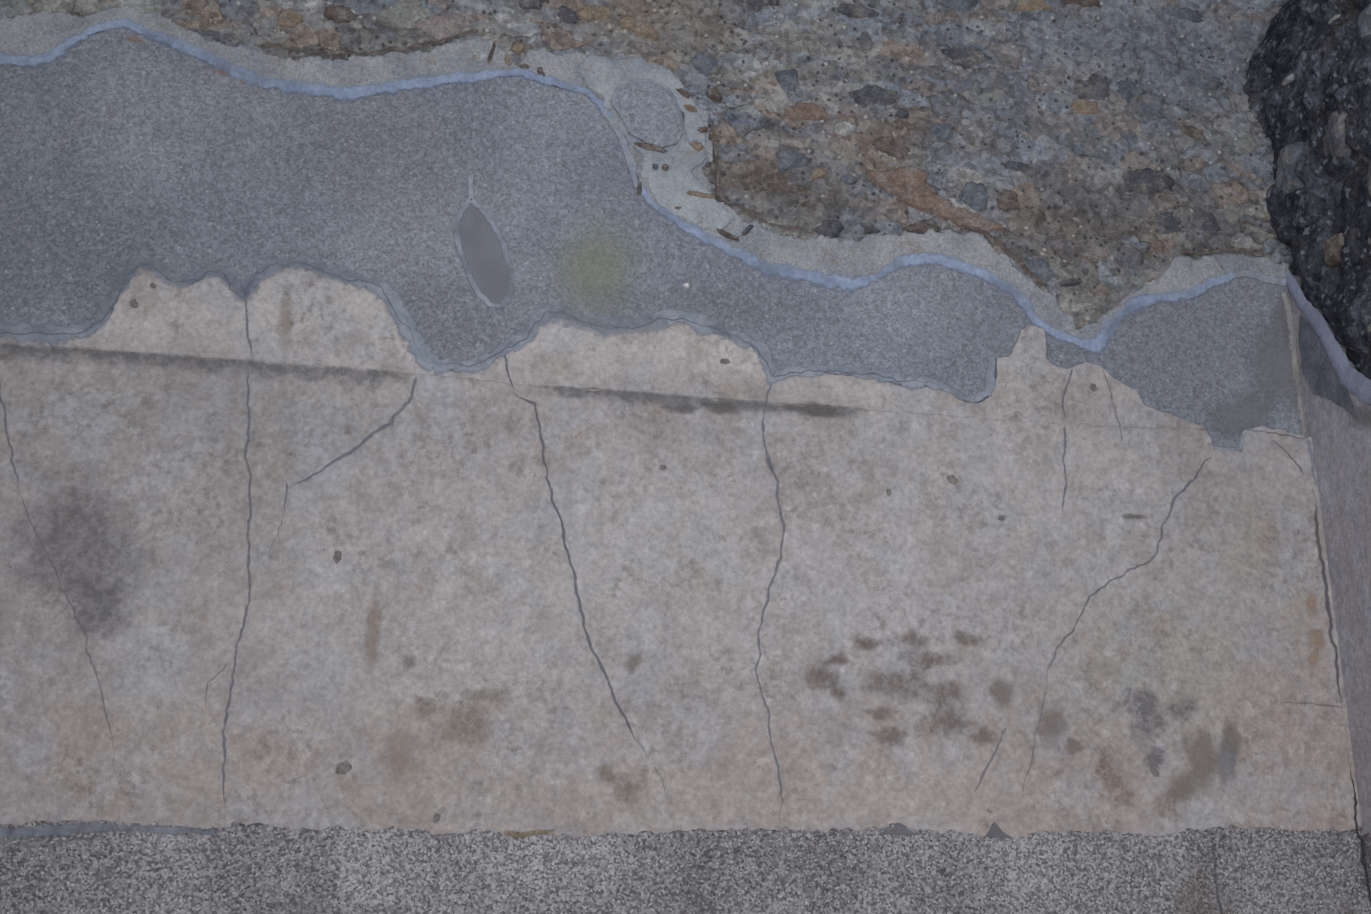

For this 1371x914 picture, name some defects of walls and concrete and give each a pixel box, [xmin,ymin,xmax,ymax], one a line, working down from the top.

spalling [0,0,1371,451]
crack [222,298,417,796]
crack [504,355,644,750]
crack [755,383,785,795]
damp [812,656,845,697]
mould [874,634,992,742]
crack [977,728,1006,788]
crack [1049,457,1210,666]
damp [1171,727,1238,797]